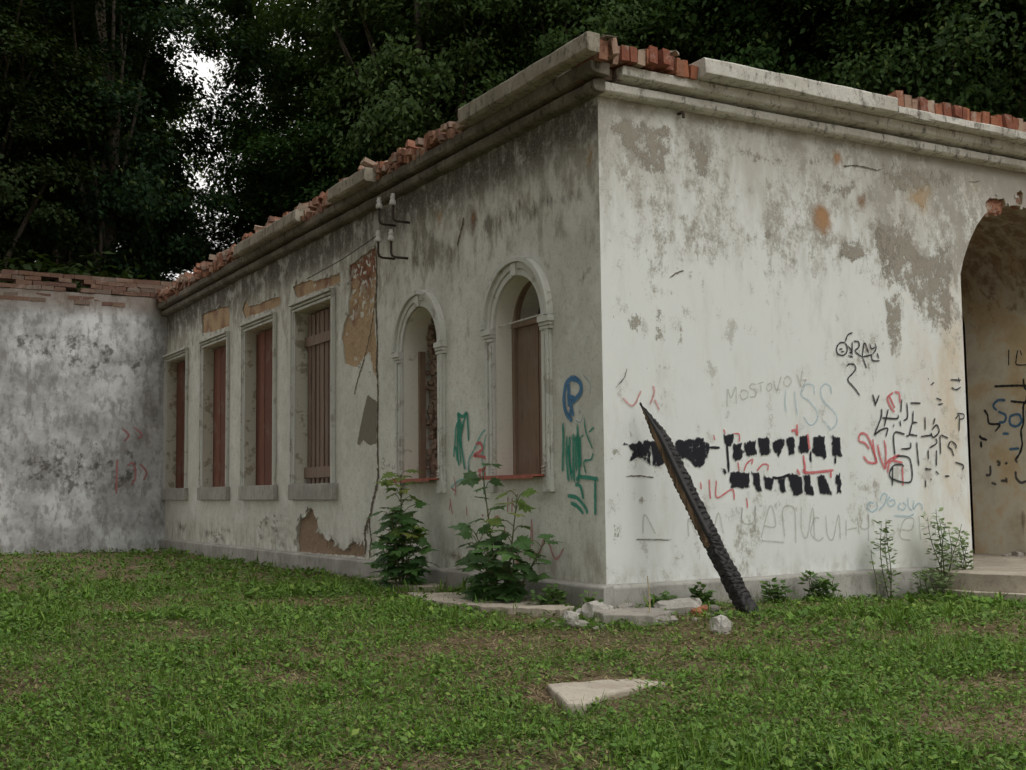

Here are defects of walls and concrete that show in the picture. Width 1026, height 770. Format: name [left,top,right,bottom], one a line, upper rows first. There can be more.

corrosion [815,207,830,233]
crack [354,250,379,557]